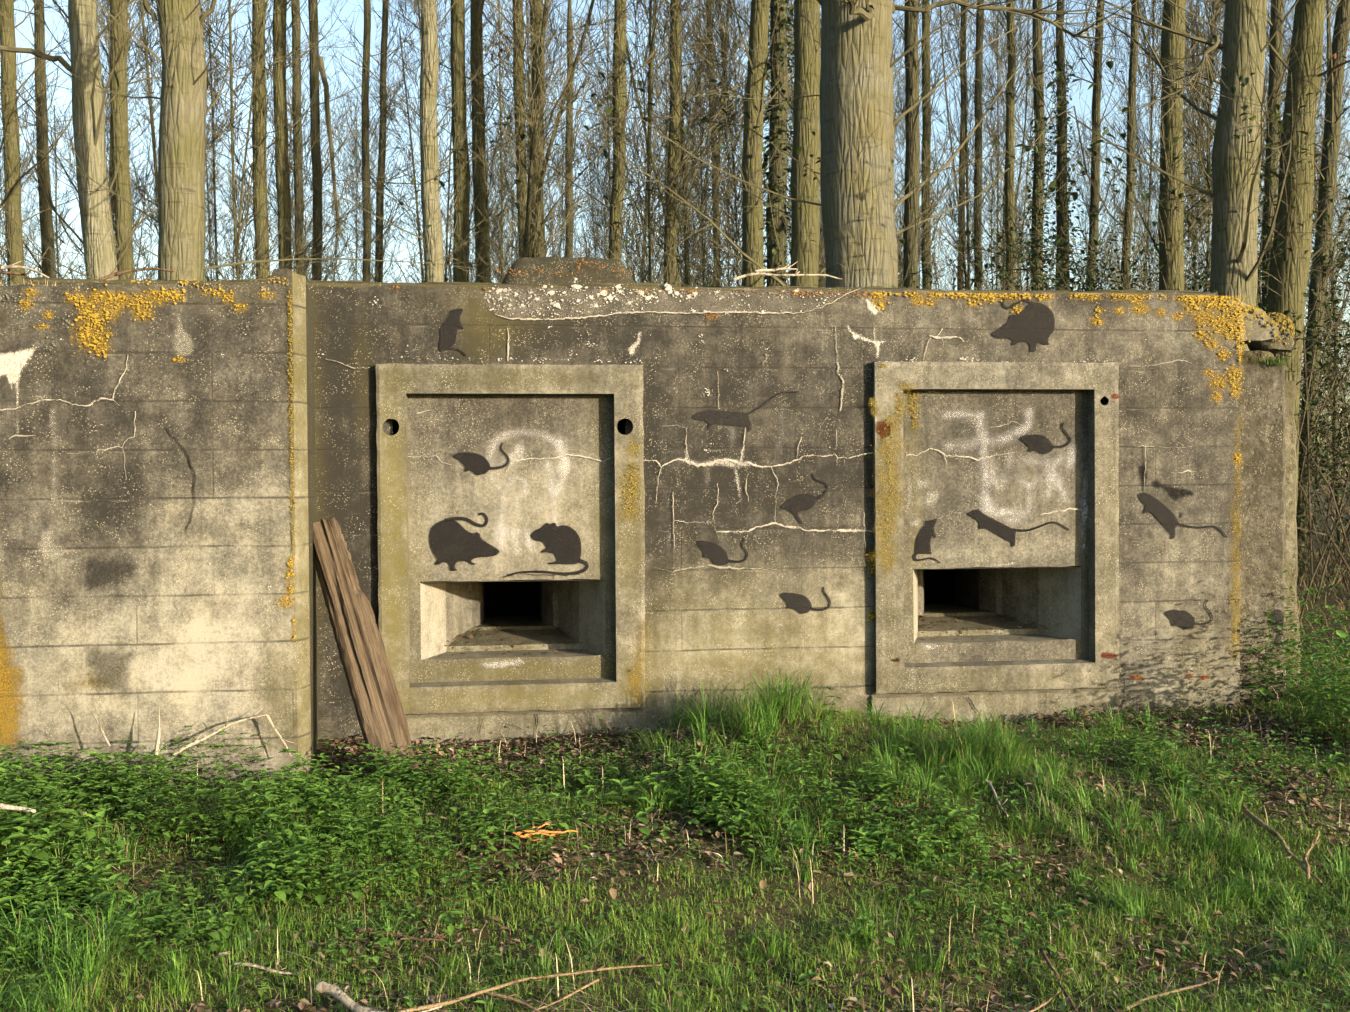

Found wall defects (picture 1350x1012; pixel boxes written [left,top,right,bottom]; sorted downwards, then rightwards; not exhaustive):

crack [924,328,964,356]
damp [0,349,33,398]
crack [0,355,196,533]
crack [506,326,874,572]
corrosion [876,421,891,438]
crack [906,421,1025,464]
crack [1041,507,1082,515]